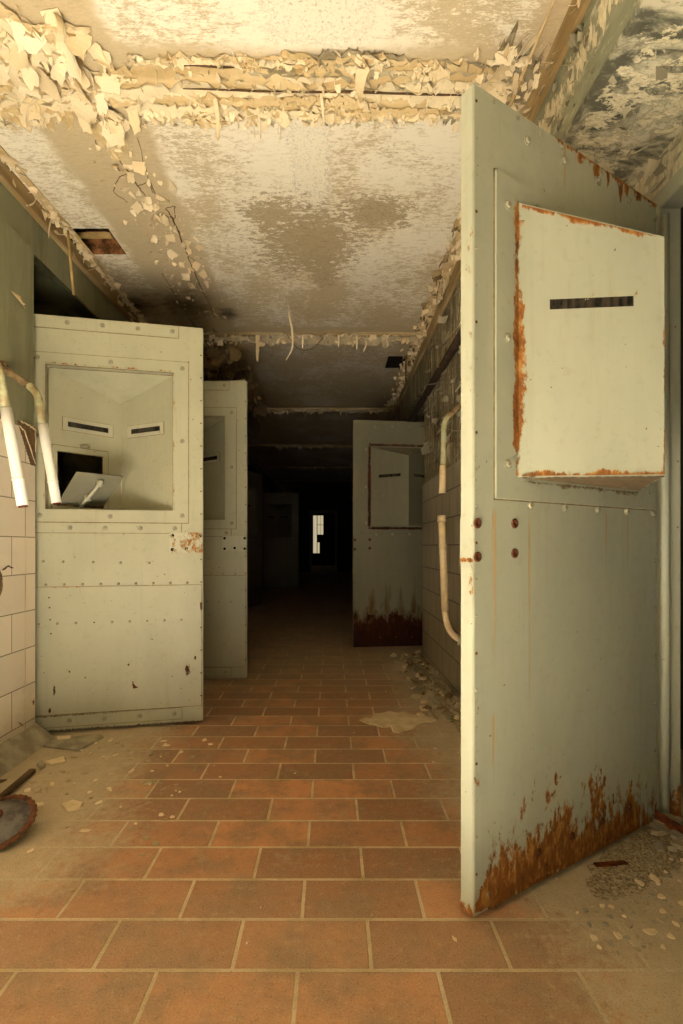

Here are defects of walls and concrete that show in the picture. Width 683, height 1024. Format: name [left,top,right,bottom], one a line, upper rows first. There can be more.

peeling [0,0,623,479]
water stain [224,178,423,290]
corrosion [550,133,657,209]
peeling [572,21,683,200]
corrosion [512,199,665,476]
corrosion [169,532,203,553]
corrosion [353,576,422,647]
corrosion [460,765,657,917]